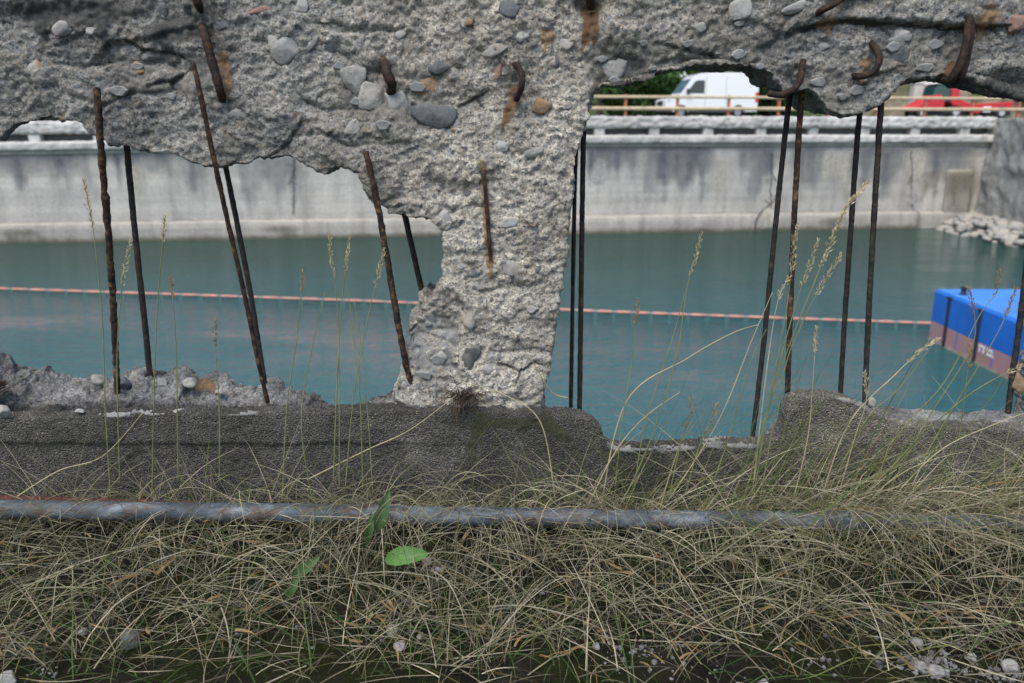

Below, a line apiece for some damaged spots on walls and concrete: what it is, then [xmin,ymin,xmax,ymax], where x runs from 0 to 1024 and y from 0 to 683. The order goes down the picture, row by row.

corrosion [218,52,232,100]
corrosion [501,85,523,130]
corrosion [580,4,599,51]
spalling [592,37,666,85]
spalling [93,0,270,403]
spalling [362,151,458,385]
corrosion [479,160,493,280]
spalling [569,121,587,410]
spalling [609,15,975,453]
crack [496,361,548,384]
spalling [1005,261,1024,413]